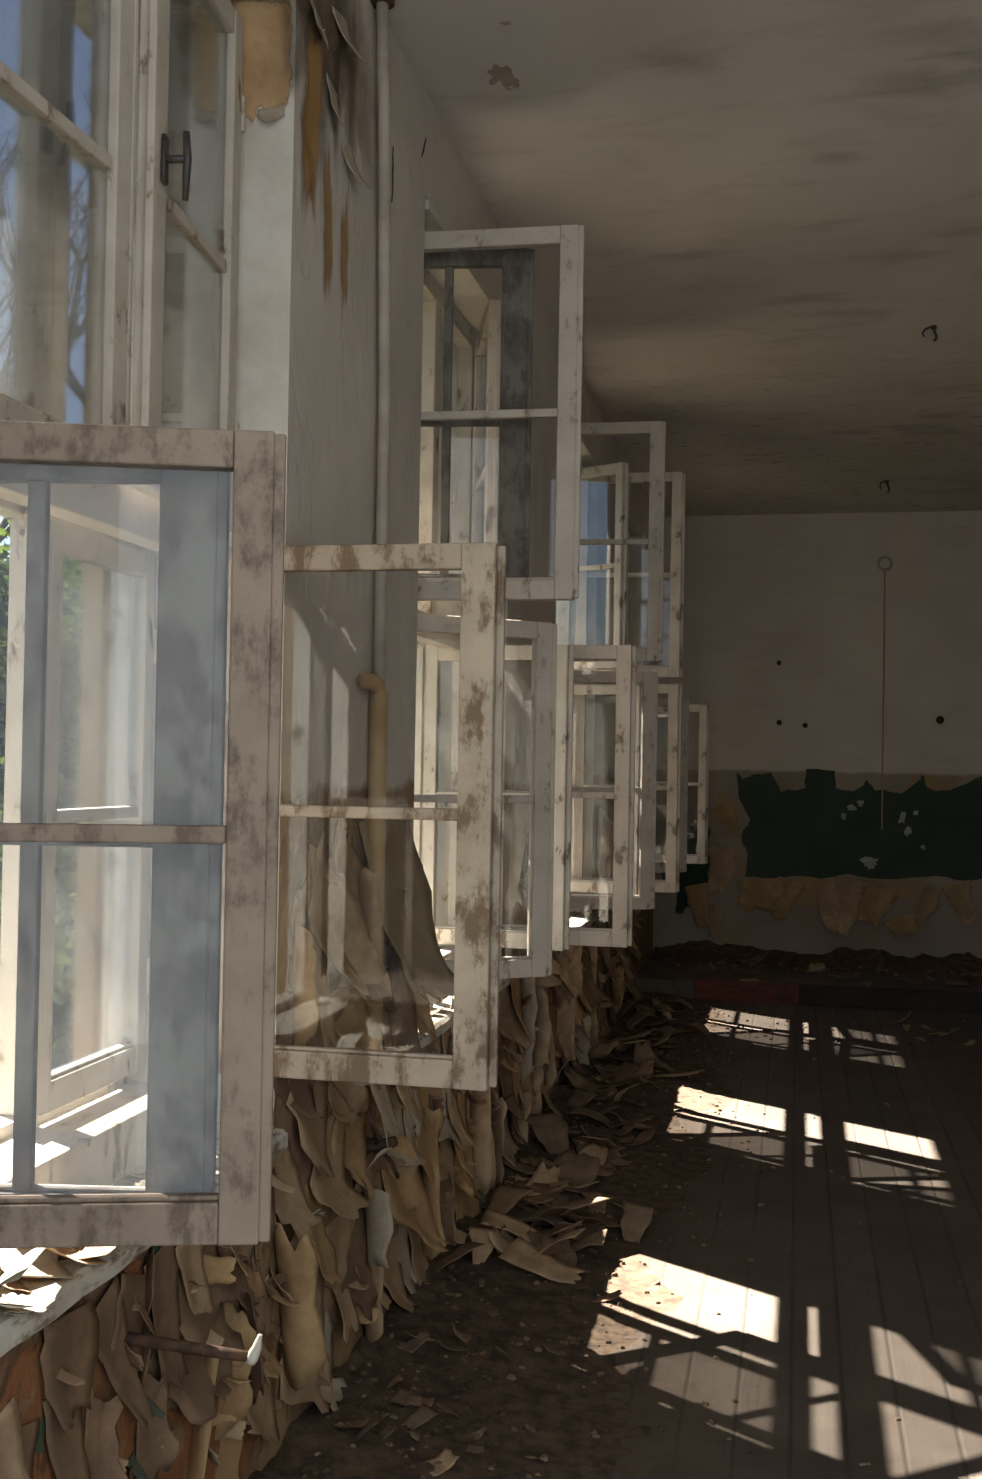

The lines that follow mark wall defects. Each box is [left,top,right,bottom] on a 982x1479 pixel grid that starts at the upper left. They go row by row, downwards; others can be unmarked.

spalling [230,0,292,122]
leakage [286,0,368,301]
peeling [310,0,370,64]
peeling [326,73,370,189]
peeling [488,64,519,91]
peeling [278,788,454,1055]
peeling [503,803,529,925]
peeling [570,800,614,929]
peeling [661,769,982,939]
peeling [0,909,711,1479]